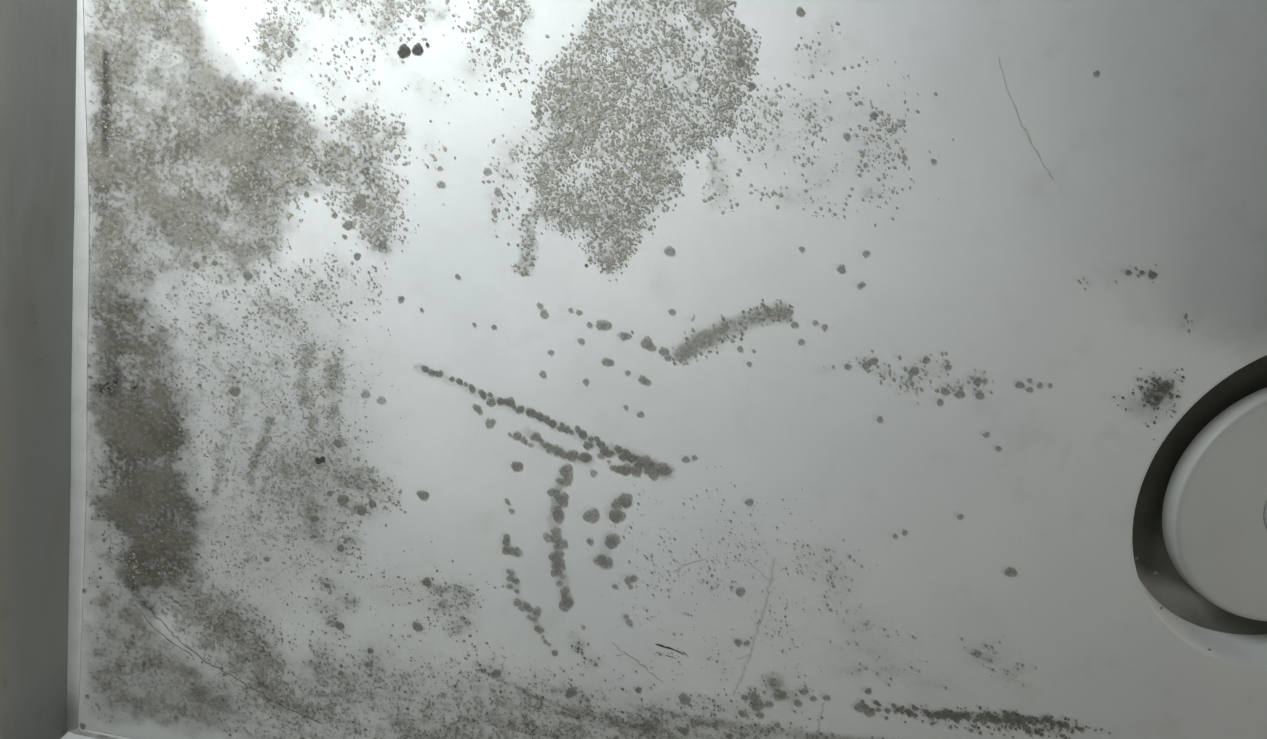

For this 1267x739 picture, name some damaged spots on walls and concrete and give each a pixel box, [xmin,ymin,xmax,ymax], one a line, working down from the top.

mould [1115,264,1157,283]
water stain [79,0,934,739]
mould [823,350,993,406]
mould [1015,378,1052,392]
water stain [1113,368,1185,440]
water stain [854,688,1111,739]